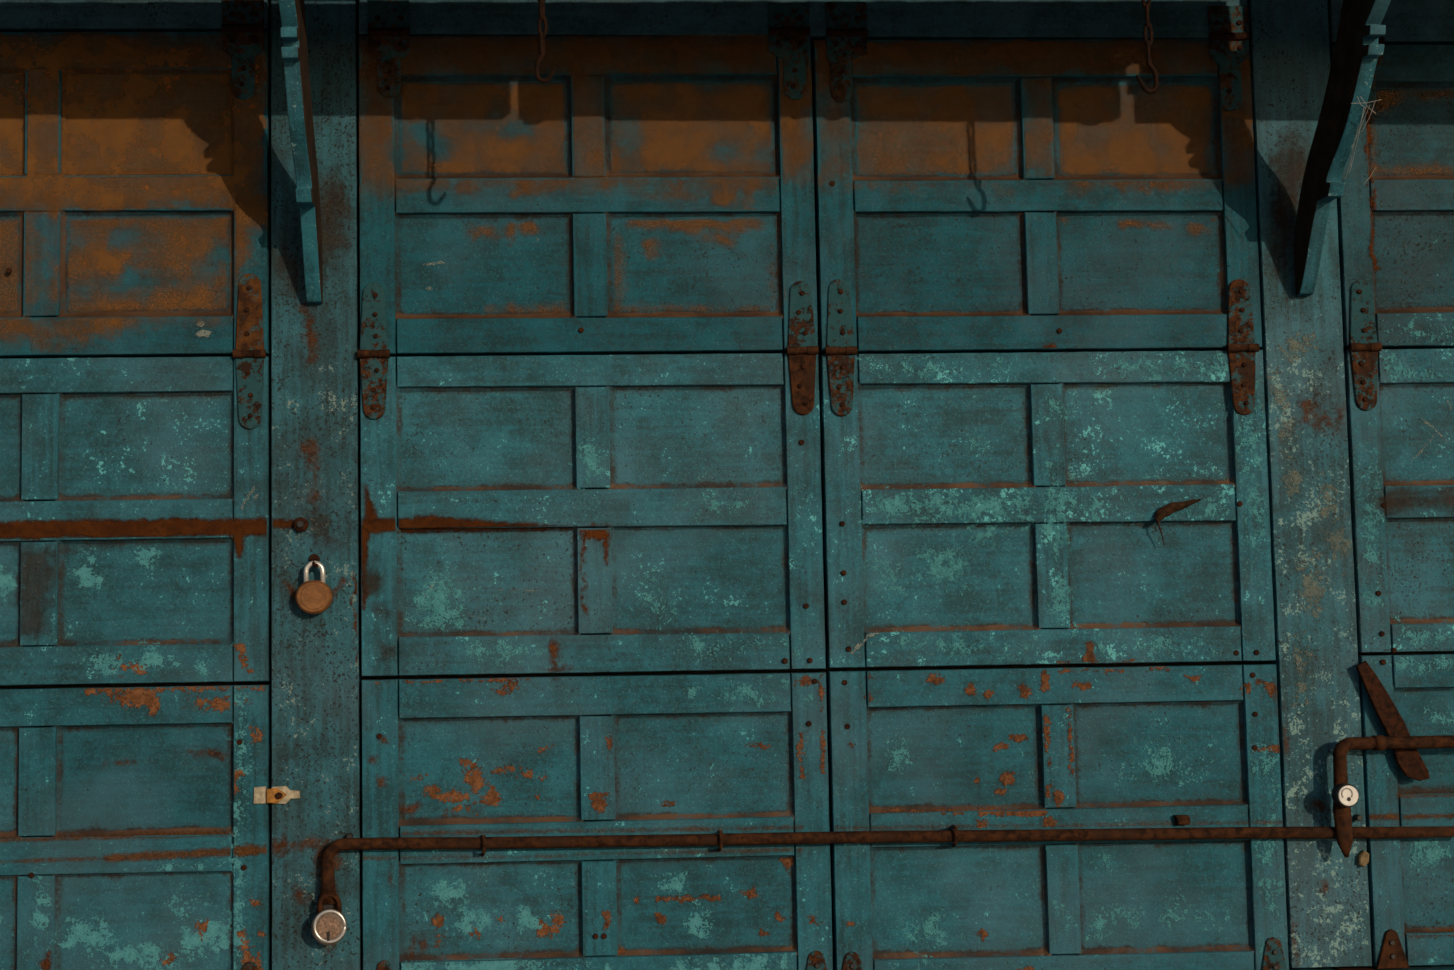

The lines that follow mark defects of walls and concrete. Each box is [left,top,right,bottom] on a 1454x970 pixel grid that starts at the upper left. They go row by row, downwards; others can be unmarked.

rust [1365,109,1380,270]
peeling [71,548,104,599]
rust [0,517,294,558]
peeling [856,366,1225,703]
peeling [0,638,266,970]
peeling [404,745,554,817]
peeling [588,792,609,814]
peeling [882,771,1065,828]
peeling [993,706,1075,775]
peeling [1042,729,1287,956]
peeling [401,876,627,970]
peeling [633,868,796,970]